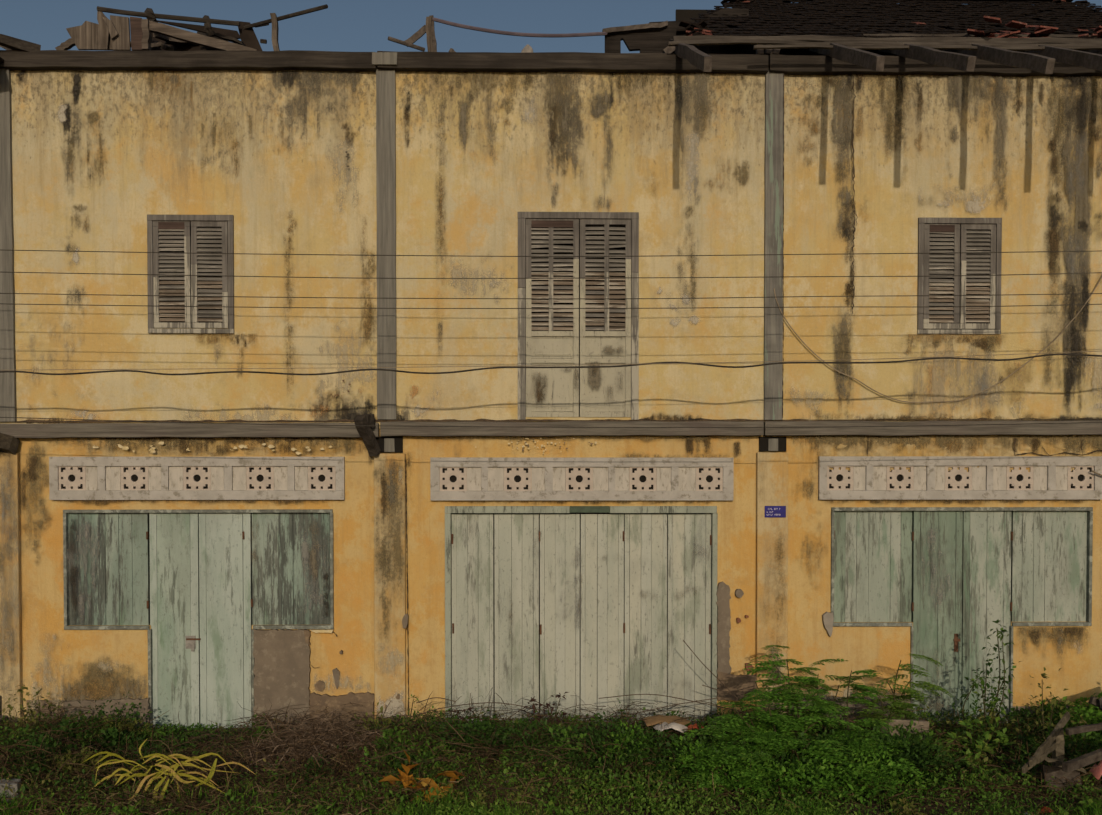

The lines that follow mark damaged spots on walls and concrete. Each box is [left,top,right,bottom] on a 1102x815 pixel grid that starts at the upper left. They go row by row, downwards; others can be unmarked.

damp [63,73,99,179]
damp [435,71,653,171]
damp [669,72,712,193]
damp [728,164,748,185]
damp [807,74,863,247]
damp [862,74,1102,421]
damp [833,314,852,398]
damp [793,435,1102,455]
damp [369,456,409,581]